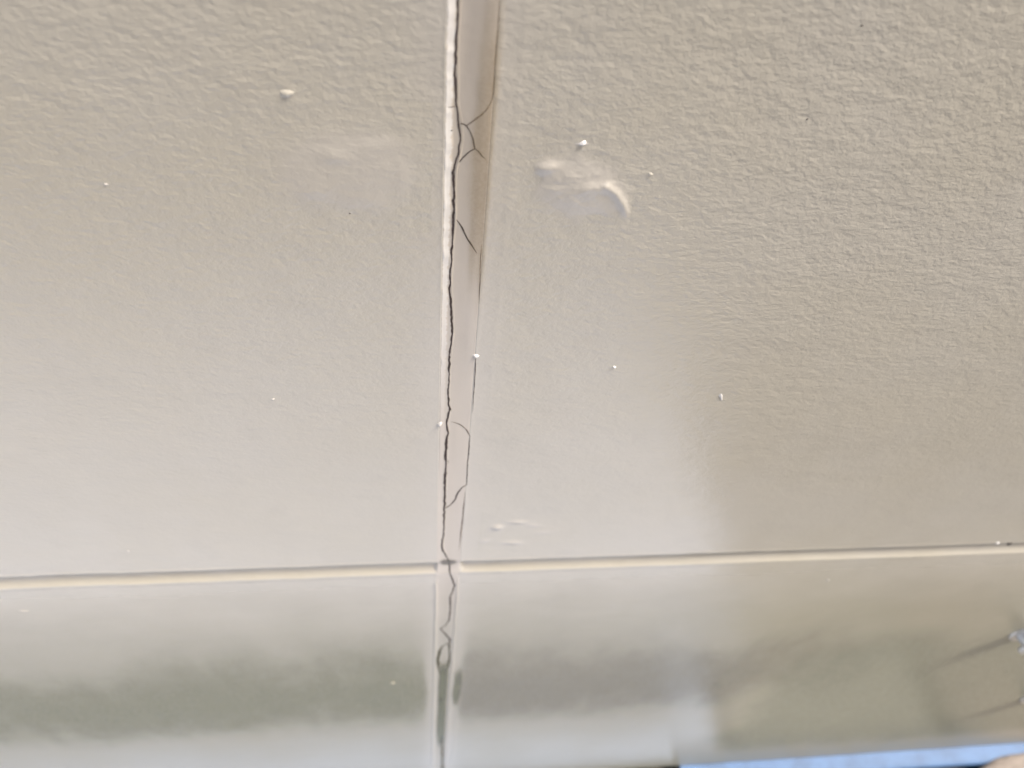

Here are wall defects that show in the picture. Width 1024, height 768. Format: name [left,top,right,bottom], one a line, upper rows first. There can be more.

crack [436,0,500,673]
crack [438,737,446,768]